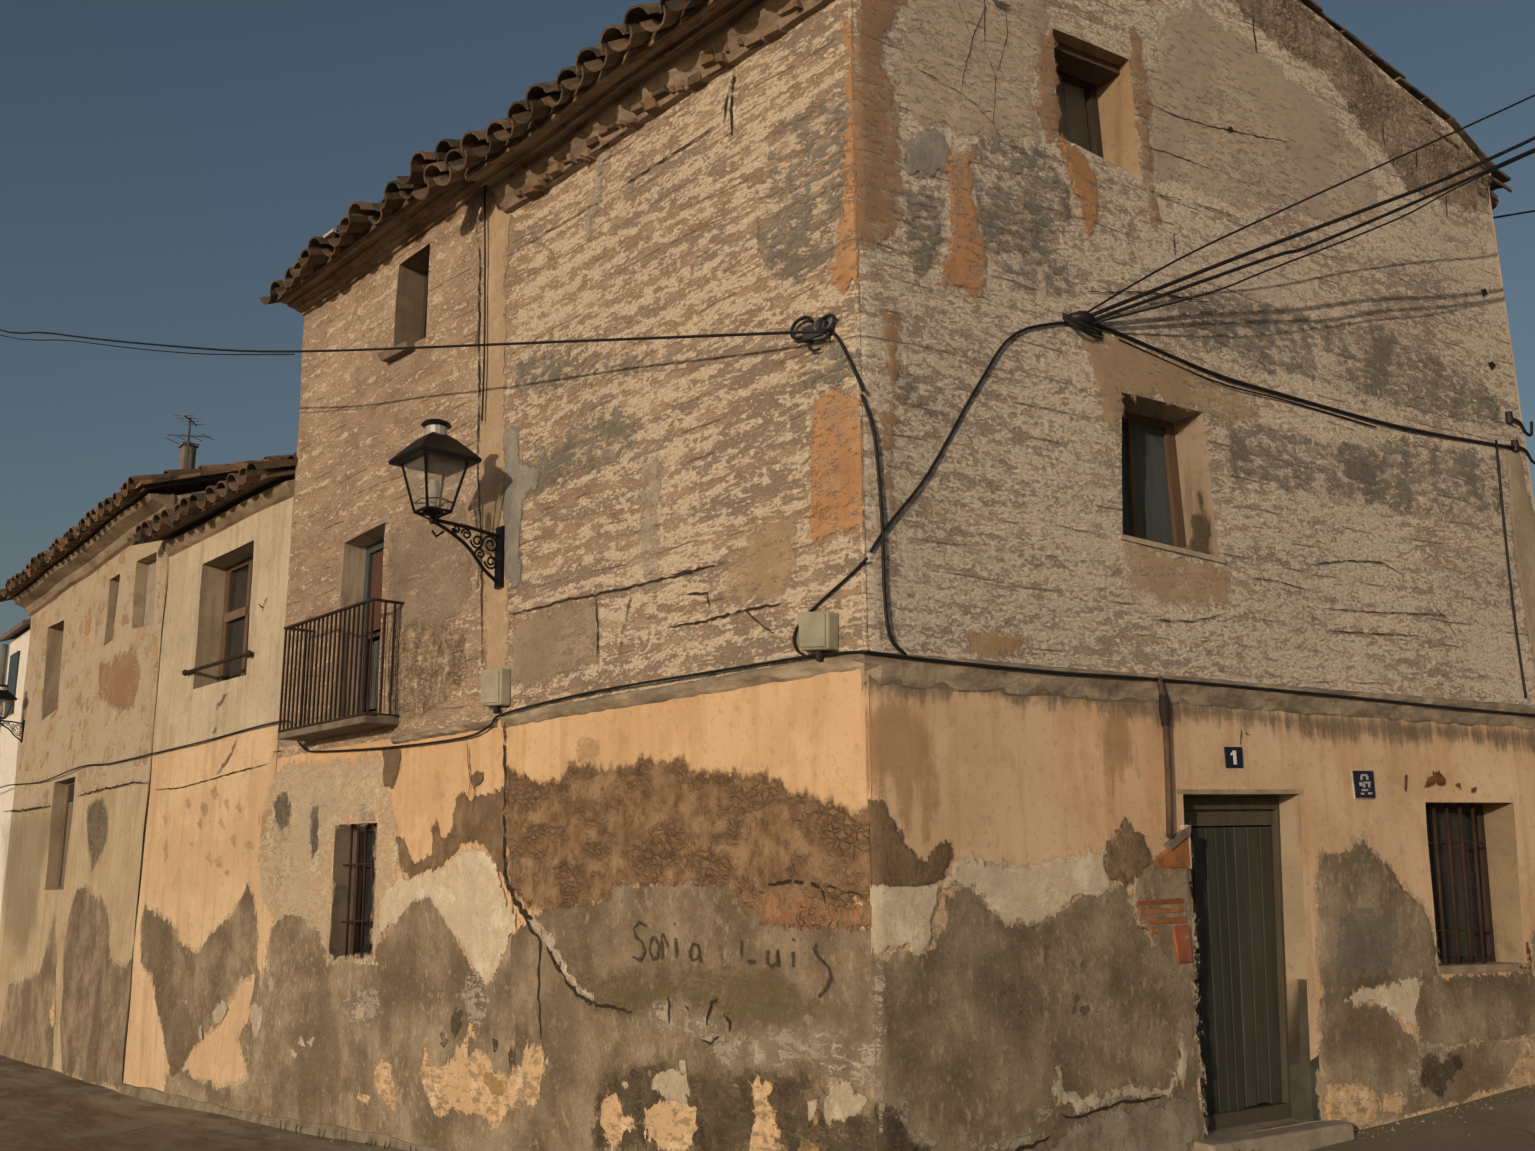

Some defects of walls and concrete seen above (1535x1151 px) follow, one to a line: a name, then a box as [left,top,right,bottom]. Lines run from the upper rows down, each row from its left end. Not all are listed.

crack [466,722,632,1039]
flaking render [0,825,1208,1151]
water stain [867,799,954,887]
flaking render [1313,831,1535,1131]